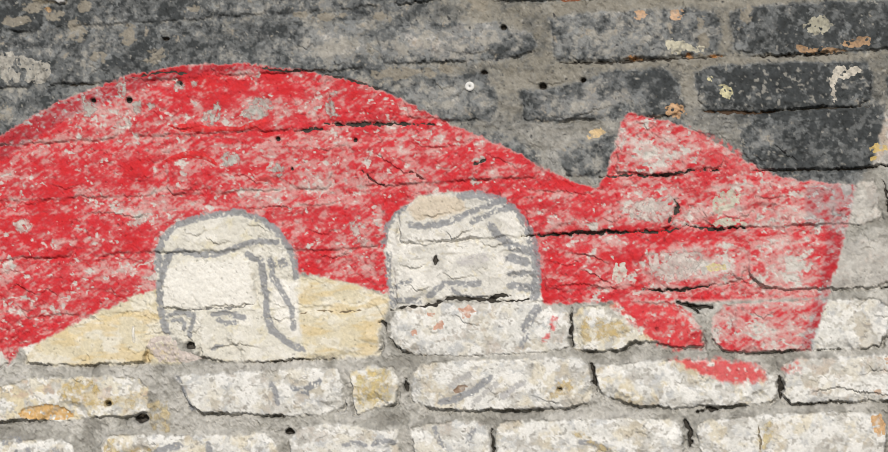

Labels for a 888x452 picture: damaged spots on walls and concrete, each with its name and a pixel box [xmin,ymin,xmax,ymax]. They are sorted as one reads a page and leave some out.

spalling [670,9,684,21]